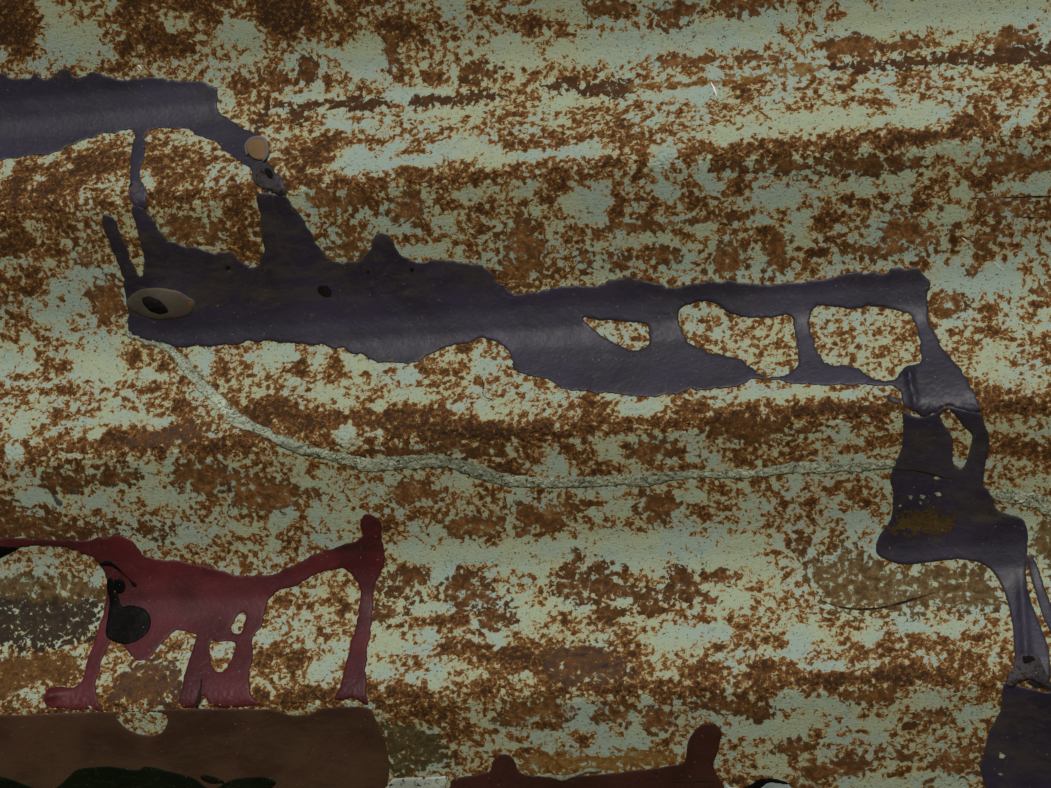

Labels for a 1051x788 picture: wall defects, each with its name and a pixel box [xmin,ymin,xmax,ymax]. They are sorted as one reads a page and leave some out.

corrosion [254,95,392,136]
corrosion [408,60,508,110]
corrosion [539,27,1051,99]
corrosion [833,191,1040,279]
corrosion [0,459,189,549]
corrosion [125,419,323,518]
corrosion [0,571,107,702]
corrosion [371,564,520,636]
corrosion [546,547,738,619]
corrosion [788,529,1006,623]
corrosion [486,637,781,775]
corrosion [768,734,984,788]